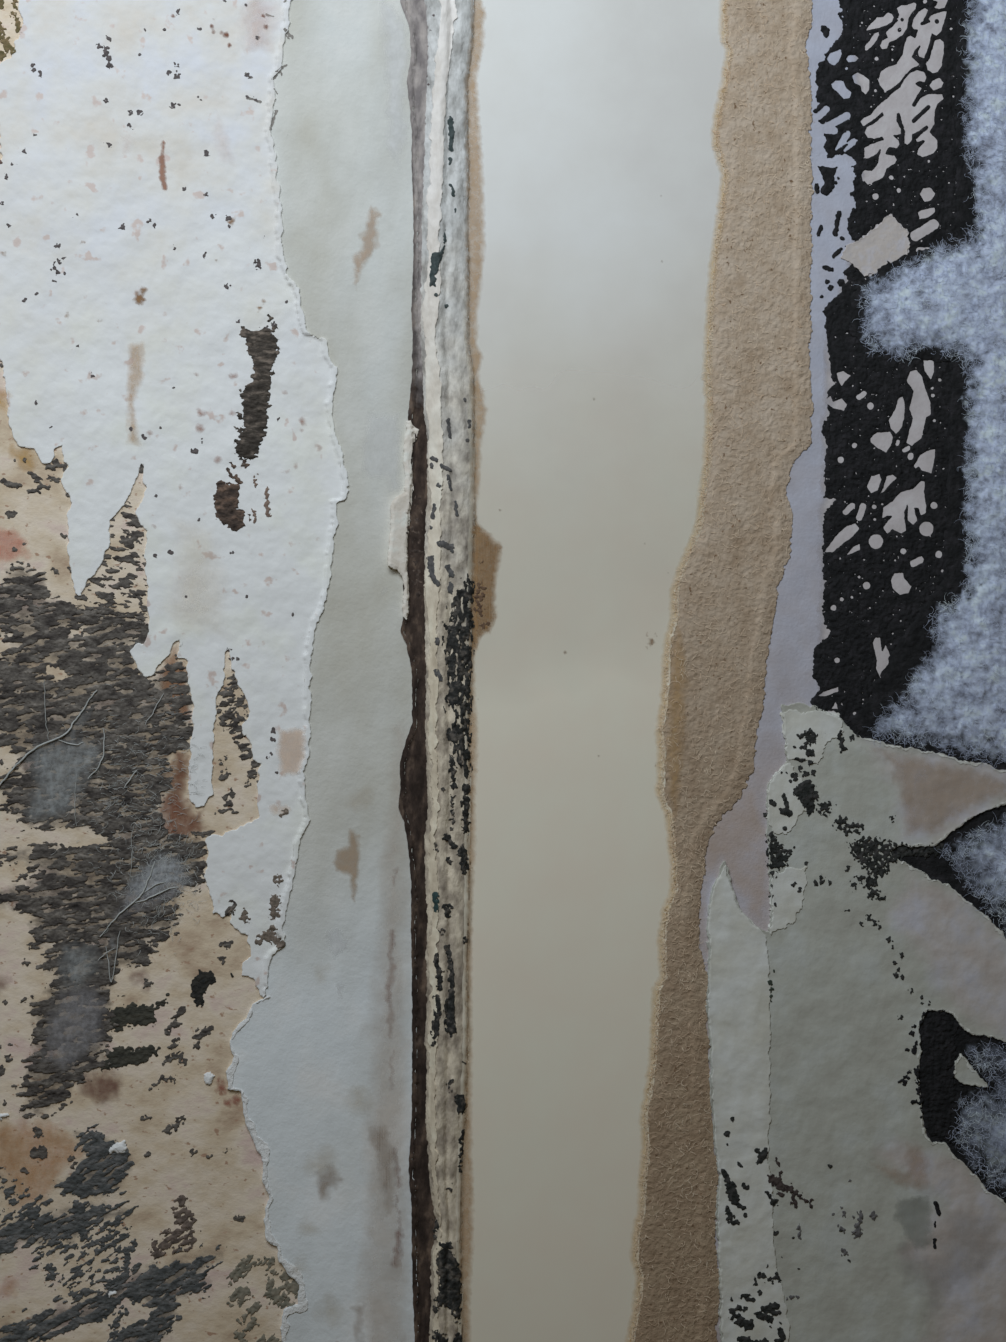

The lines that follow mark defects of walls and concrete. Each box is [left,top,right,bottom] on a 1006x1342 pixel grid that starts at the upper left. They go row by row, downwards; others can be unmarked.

leakage [0,456,70,497]
leakage [0,501,299,1342]
peeling [0,0,349,998]
leakage [406,9,711,1342]